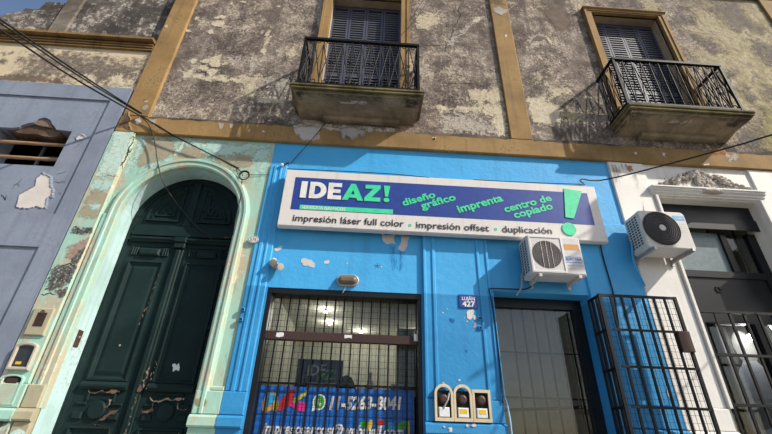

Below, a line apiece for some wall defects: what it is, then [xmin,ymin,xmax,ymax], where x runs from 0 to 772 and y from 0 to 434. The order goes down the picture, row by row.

damp [710,0,772,66]
damp [149,117,293,127]
peeling [290,116,413,141]
flaking render [15,172,56,210]
peeling [45,99,271,298]
peeling [381,234,410,252]
peeling [301,258,330,268]